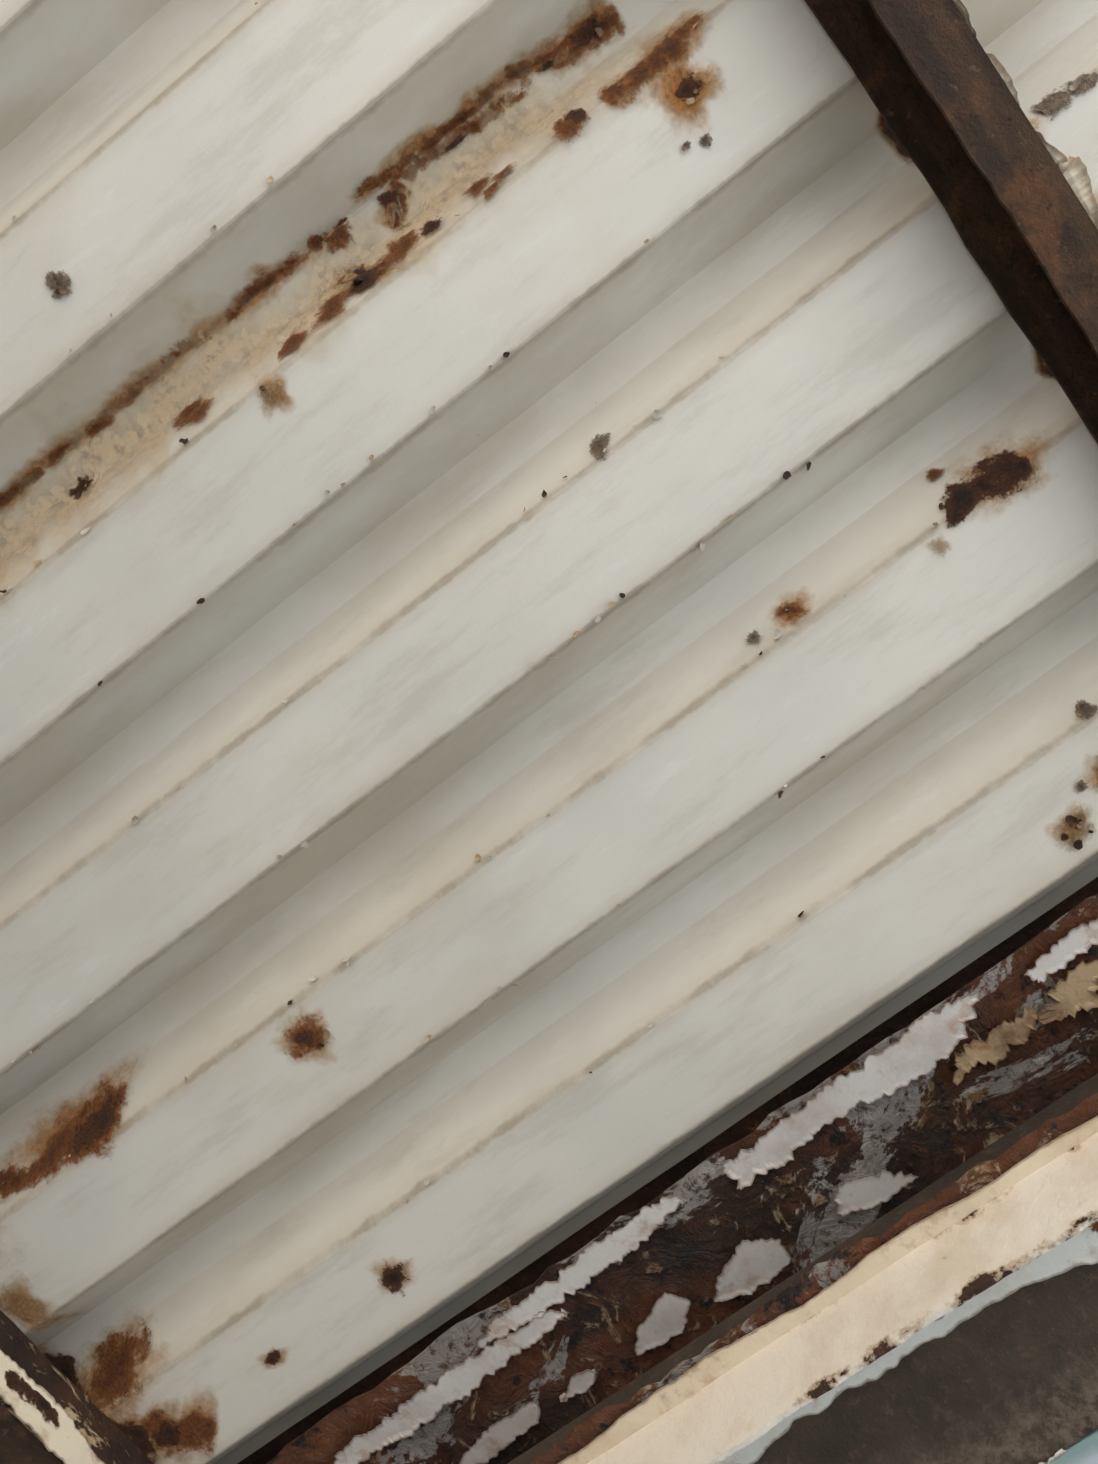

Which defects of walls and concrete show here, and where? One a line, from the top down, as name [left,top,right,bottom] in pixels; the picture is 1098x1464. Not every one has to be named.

corrosion [278,1,625,358]
peeling [1034,129,1098,229]
corrosion [0,217,353,512]
corrosion [926,446,1038,553]
peeling [1057,813,1094,850]
peeling [722,918,1098,1190]
corrosion [0,1077,127,1198]
corrosion [5,1370,60,1427]
peeling [0,1350,105,1464]
corrosion [42,1321,217,1464]
peeling [334,1195,688,1464]
peeling [558,1116,1098,1464]